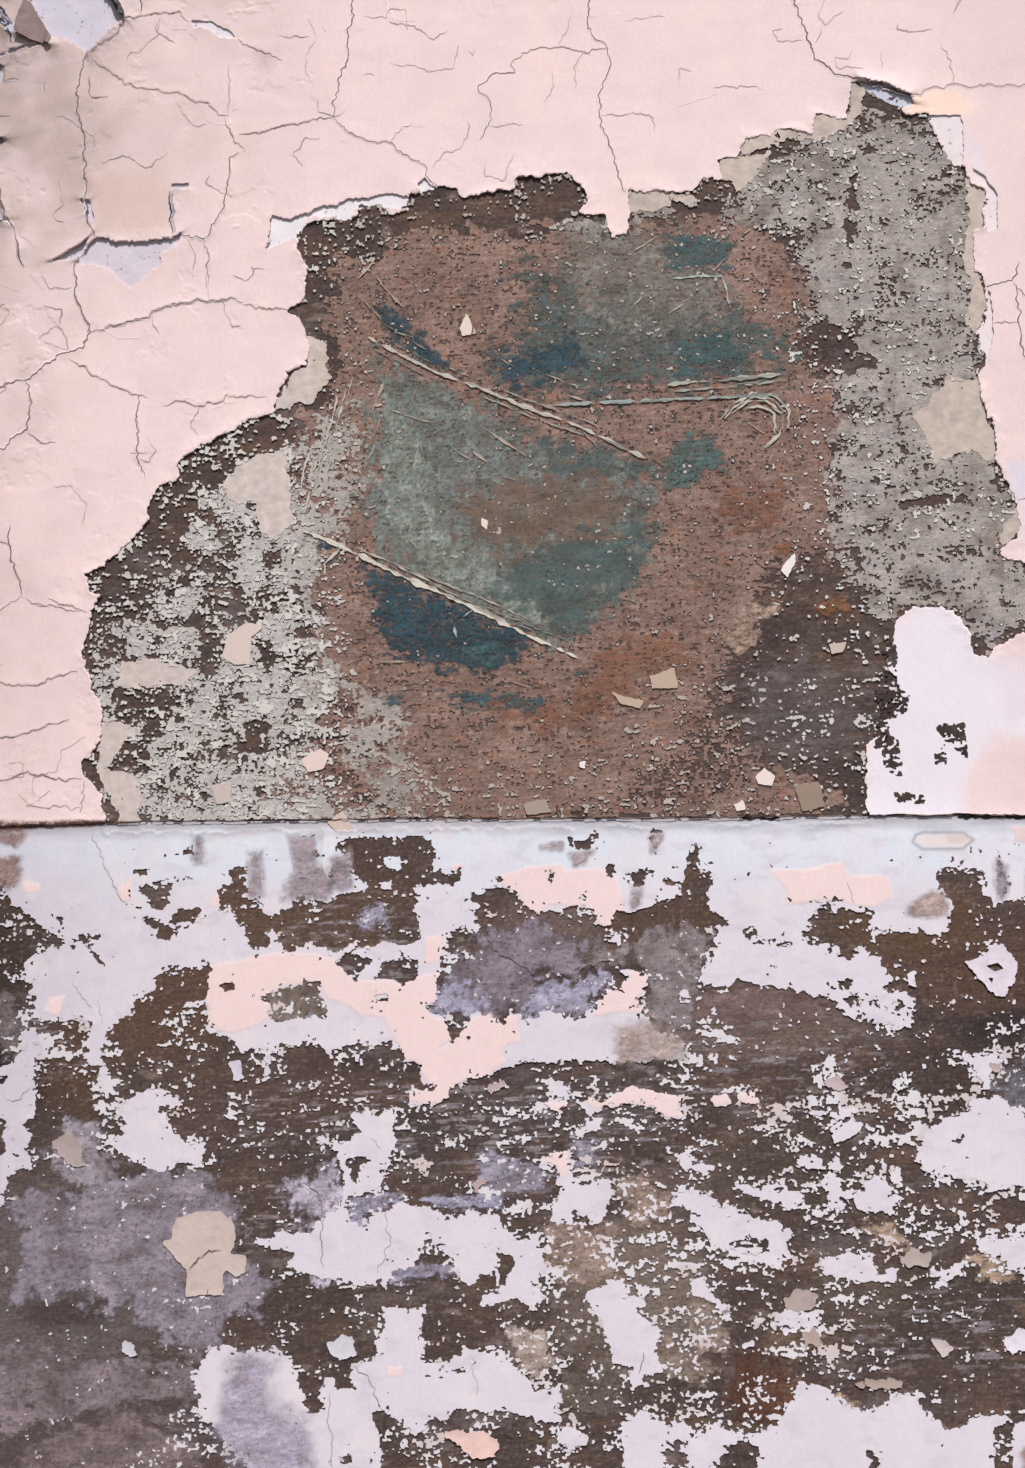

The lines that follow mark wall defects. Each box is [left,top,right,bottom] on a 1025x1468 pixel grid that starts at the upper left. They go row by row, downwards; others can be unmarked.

crack [773,0,1025,97]
peeling [54,200,181,287]
crack [0,0,757,477]
crack [987,262,1025,359]
crack [0,526,87,613]
peeling [81,81,1025,1013]
crack [0,664,76,687]
crack [0,719,126,903]
peeling [0,830,1025,1468]